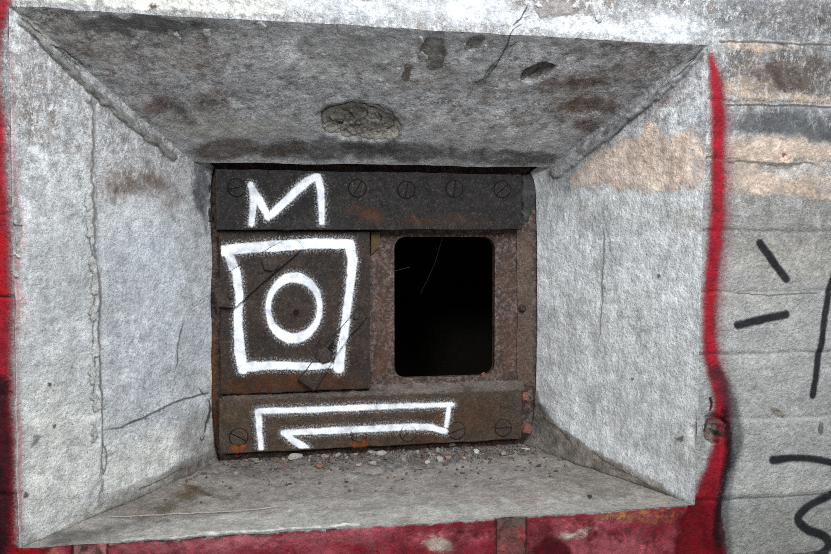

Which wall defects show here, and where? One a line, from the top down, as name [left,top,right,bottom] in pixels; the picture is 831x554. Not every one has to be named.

peeling [396,64,412,81]
peeling [418,36,452,70]
peeling [460,35,487,50]
crack [475,7,642,95]
damp [160,107,554,164]
spalling [322,101,402,140]
crack [85,99,212,474]